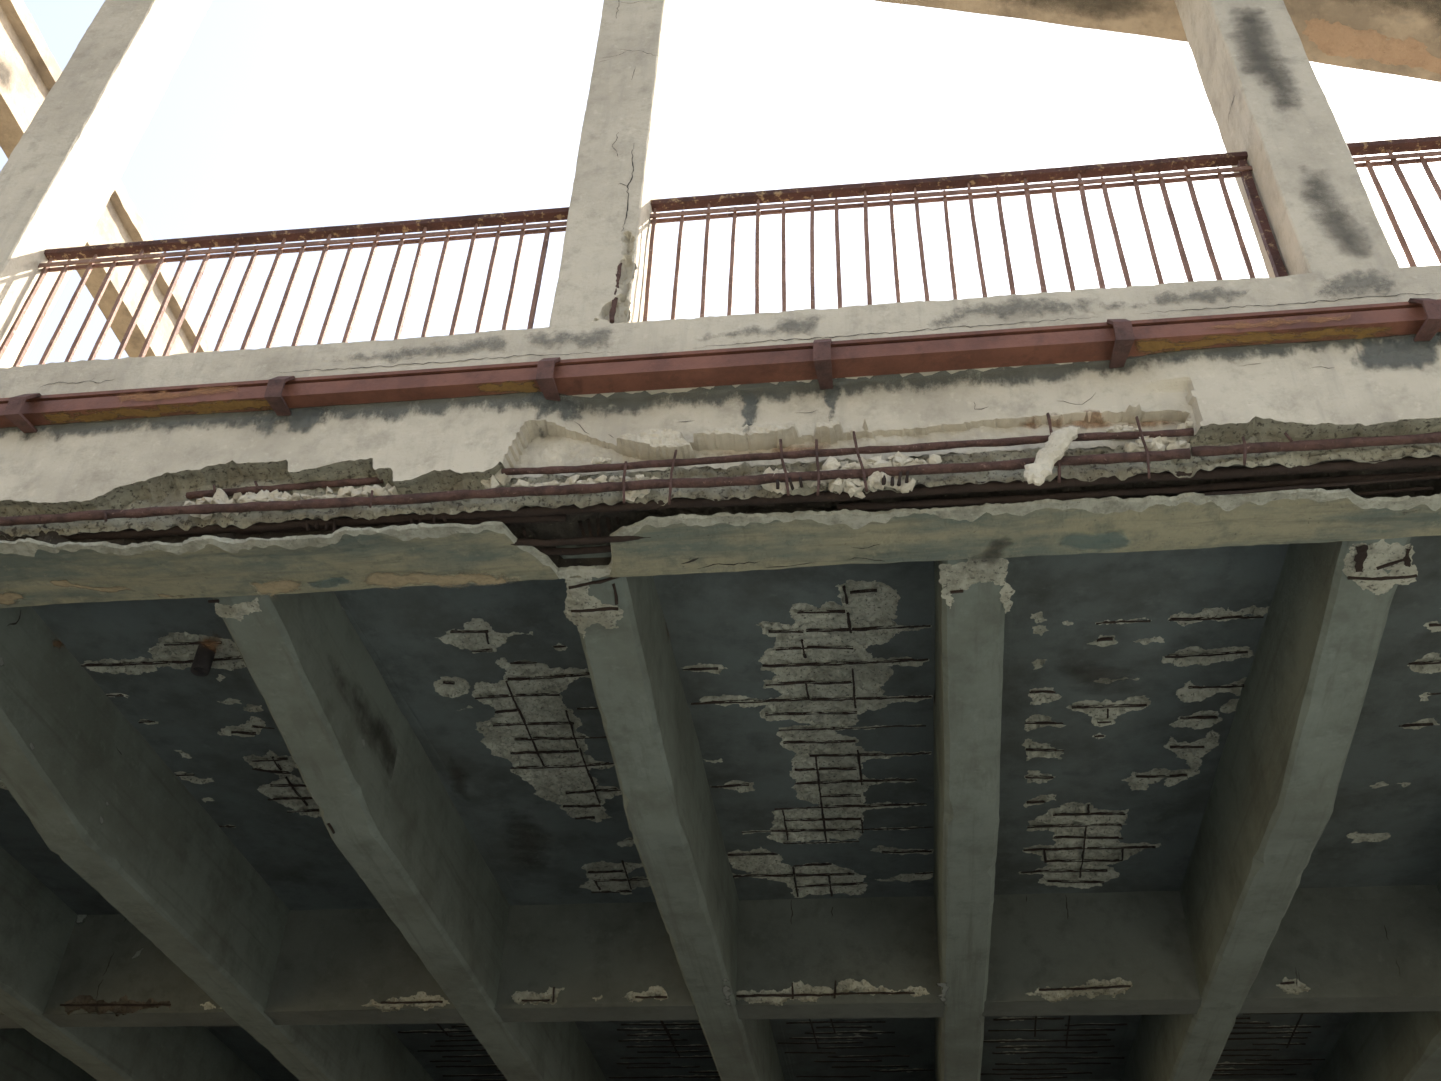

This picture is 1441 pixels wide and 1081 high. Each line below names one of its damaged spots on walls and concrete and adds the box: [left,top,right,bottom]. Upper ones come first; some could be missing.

damp [1241,15,1290,104]
crack [612,133,634,229]
damp [1308,181,1359,252]
spalling [0,413,1441,639]
spalling [81,631,246,682]
spalling [243,750,335,834]
spalling [433,618,622,823]
spalling [691,580,934,898]
spalling [1018,677,1161,889]
spalling [1087,617,1253,791]
spalling [1407,652,1441,674]
spalling [736,979,949,1078]